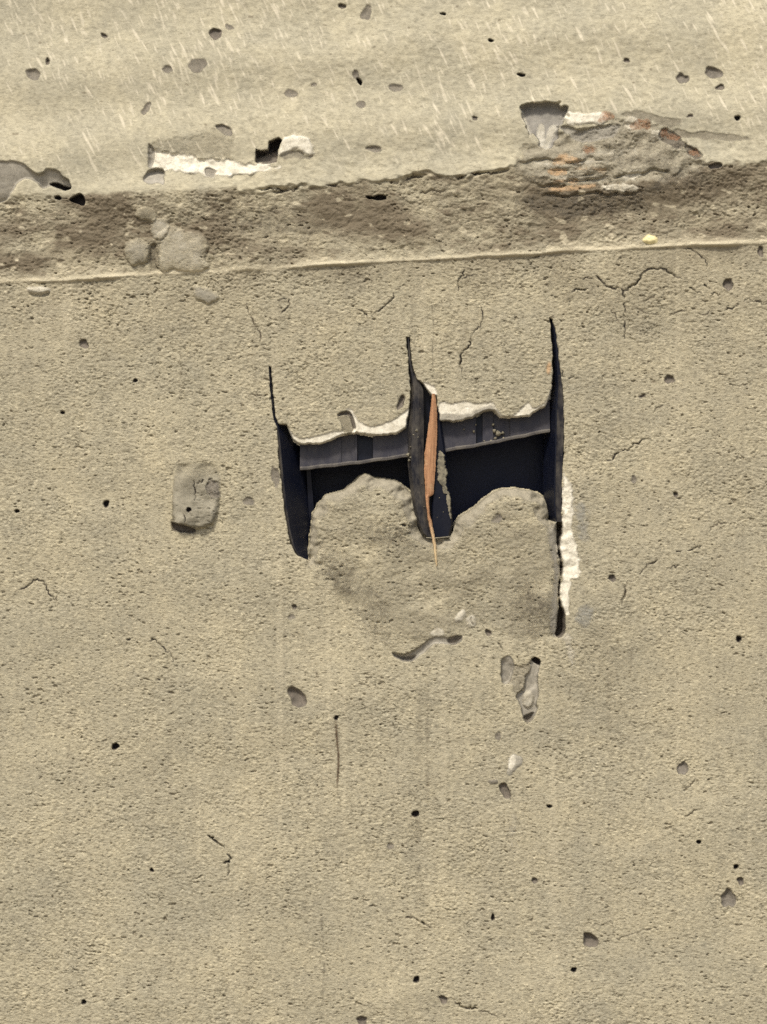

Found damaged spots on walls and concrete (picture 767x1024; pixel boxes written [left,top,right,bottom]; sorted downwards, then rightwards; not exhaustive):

spalling [0,161,71,203]
spalling [143,145,281,185]
corrosion [548,148,594,191]
spalling [517,102,748,195]
crack [572,248,761,338]
spalling [287,408,410,446]
spalling [423,382,552,423]
spalling [559,476,581,615]
spalling [392,609,475,661]
spalling [501,656,540,722]